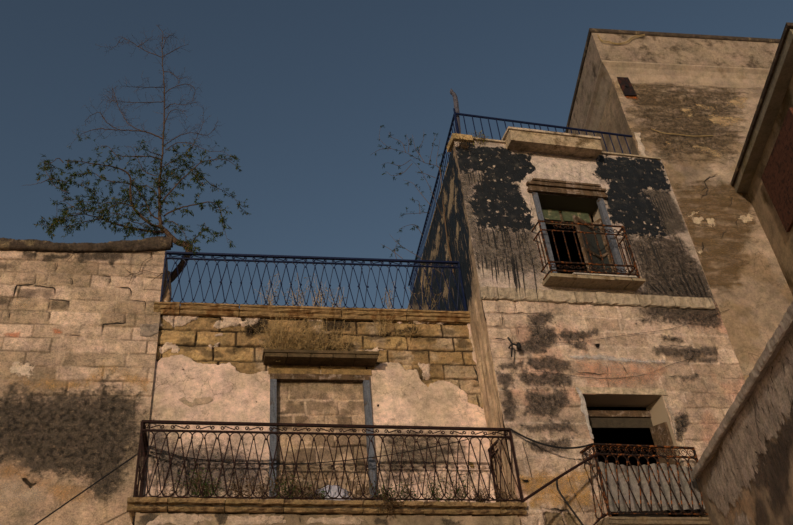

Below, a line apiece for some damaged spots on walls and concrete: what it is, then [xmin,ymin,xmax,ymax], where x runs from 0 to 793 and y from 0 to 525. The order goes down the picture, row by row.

water stain [626,84,750,162]
peeling [410,142,537,311]
spalling [156,312,483,409]
water stain [0,376,141,498]
water stain [148,424,269,495]